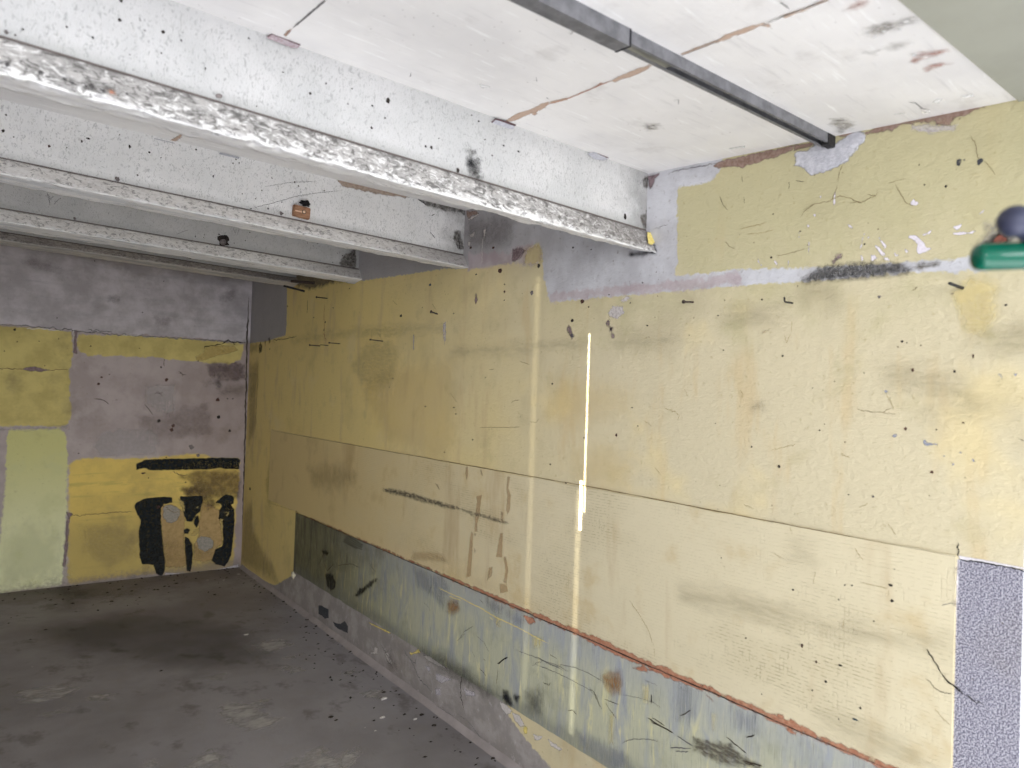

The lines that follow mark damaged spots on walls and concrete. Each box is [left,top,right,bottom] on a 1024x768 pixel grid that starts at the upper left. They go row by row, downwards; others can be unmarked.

crack [801,167,911,216]
peeling [860,230,932,261]
corrosion [311,518,897,768]